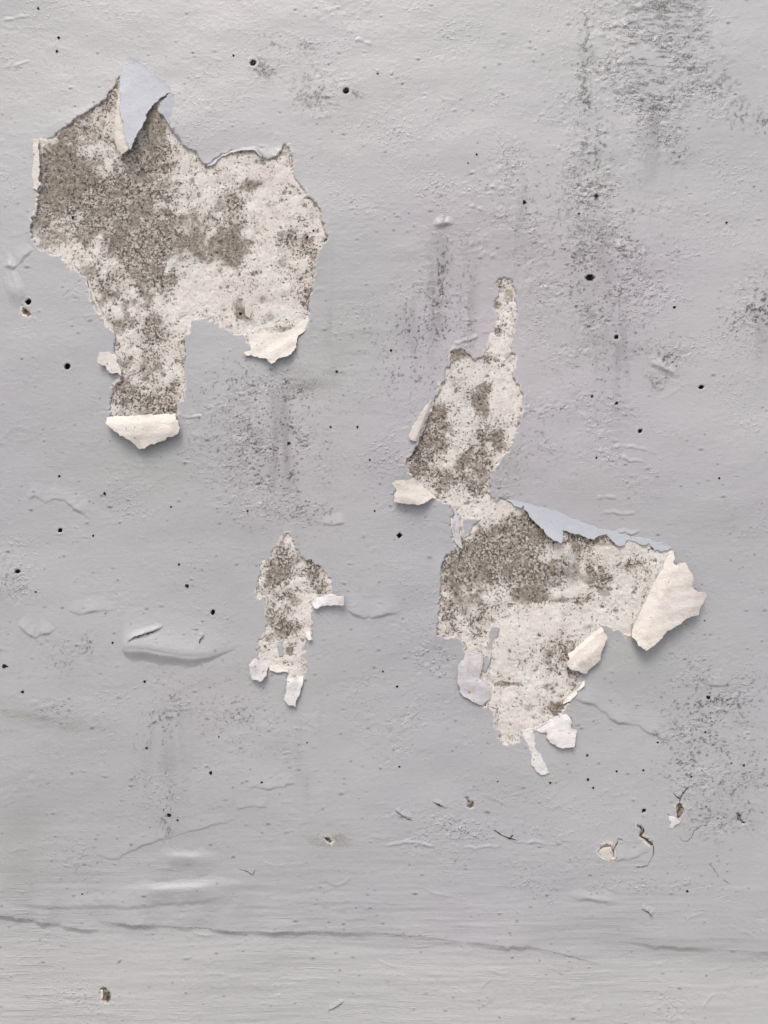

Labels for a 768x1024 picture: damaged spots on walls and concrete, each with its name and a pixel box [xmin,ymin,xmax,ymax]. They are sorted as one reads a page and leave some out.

peeling [31,56,328,449]
peeling [248,533,344,706]
peeling [392,277,707,775]